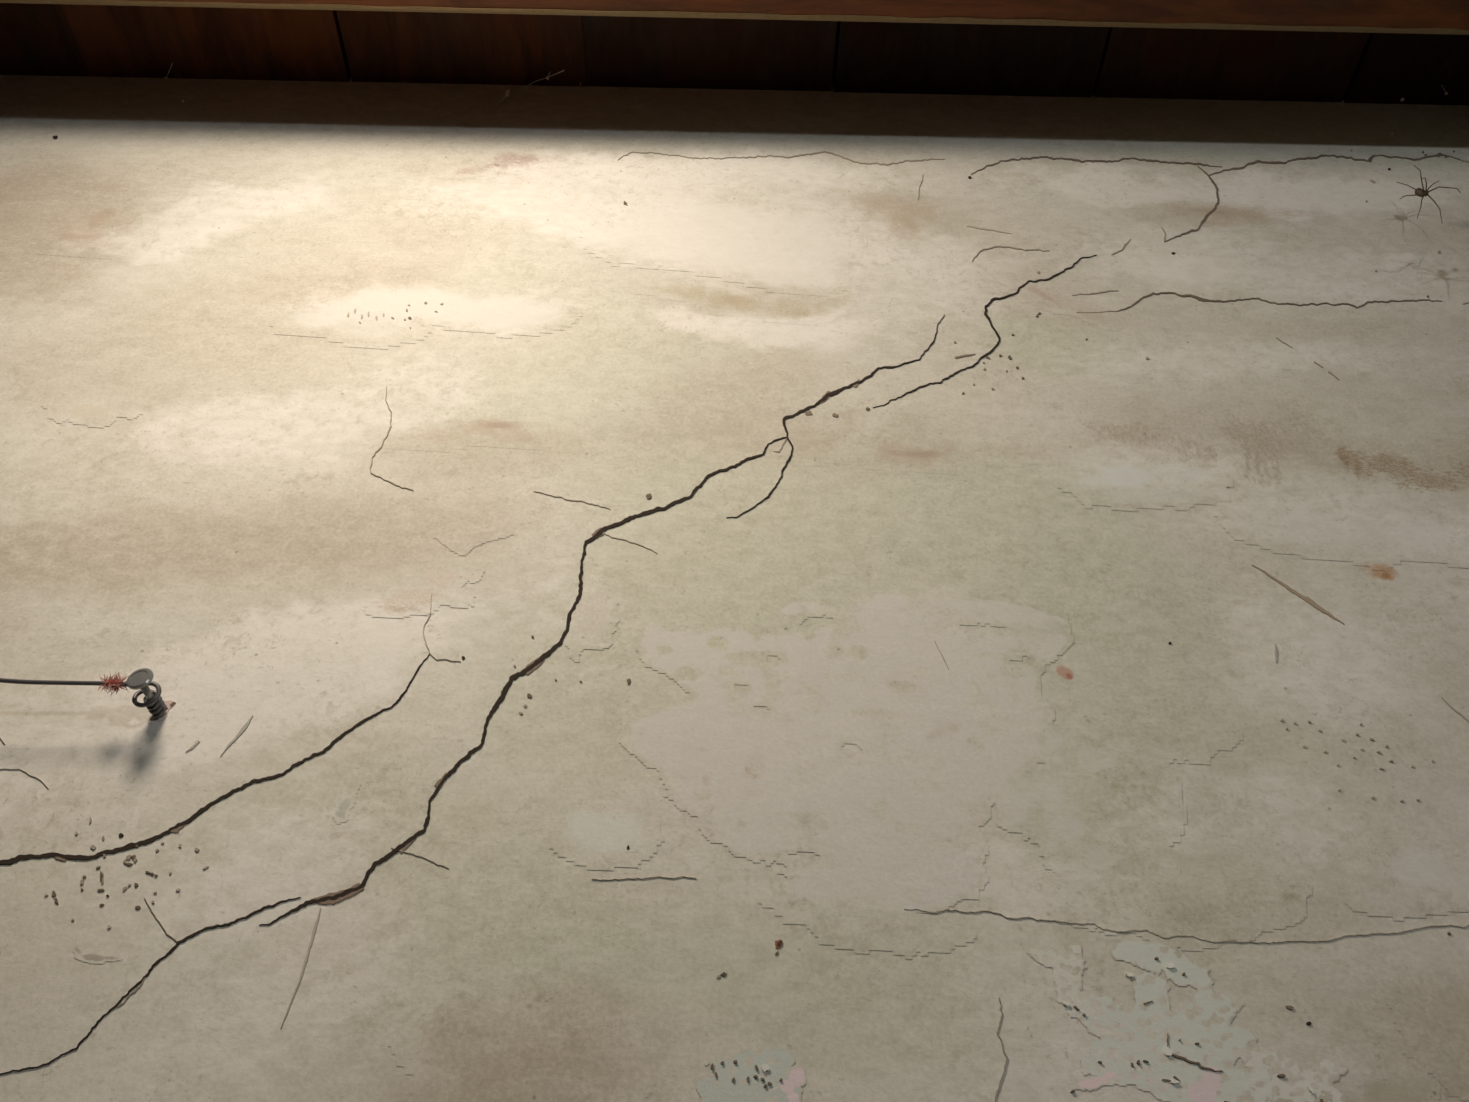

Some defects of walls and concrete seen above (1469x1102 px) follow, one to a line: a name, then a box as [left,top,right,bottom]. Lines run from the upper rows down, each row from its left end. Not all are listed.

crack [618,151,1469,243]
crack [0,226,1469,1082]
peeling [695,1046,806,1102]
crack [995,997,1008,1102]
peeling [1026,938,1348,1102]